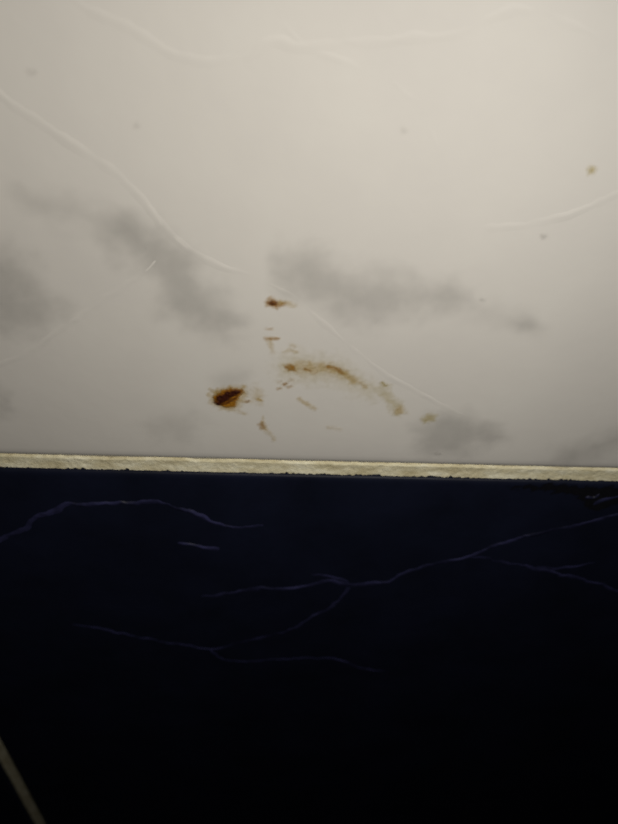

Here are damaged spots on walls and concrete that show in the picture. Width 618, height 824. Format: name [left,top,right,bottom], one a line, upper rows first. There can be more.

corrosion [213,388,244,408]
crack [0,499,263,542]
crack [72,513,618,671]